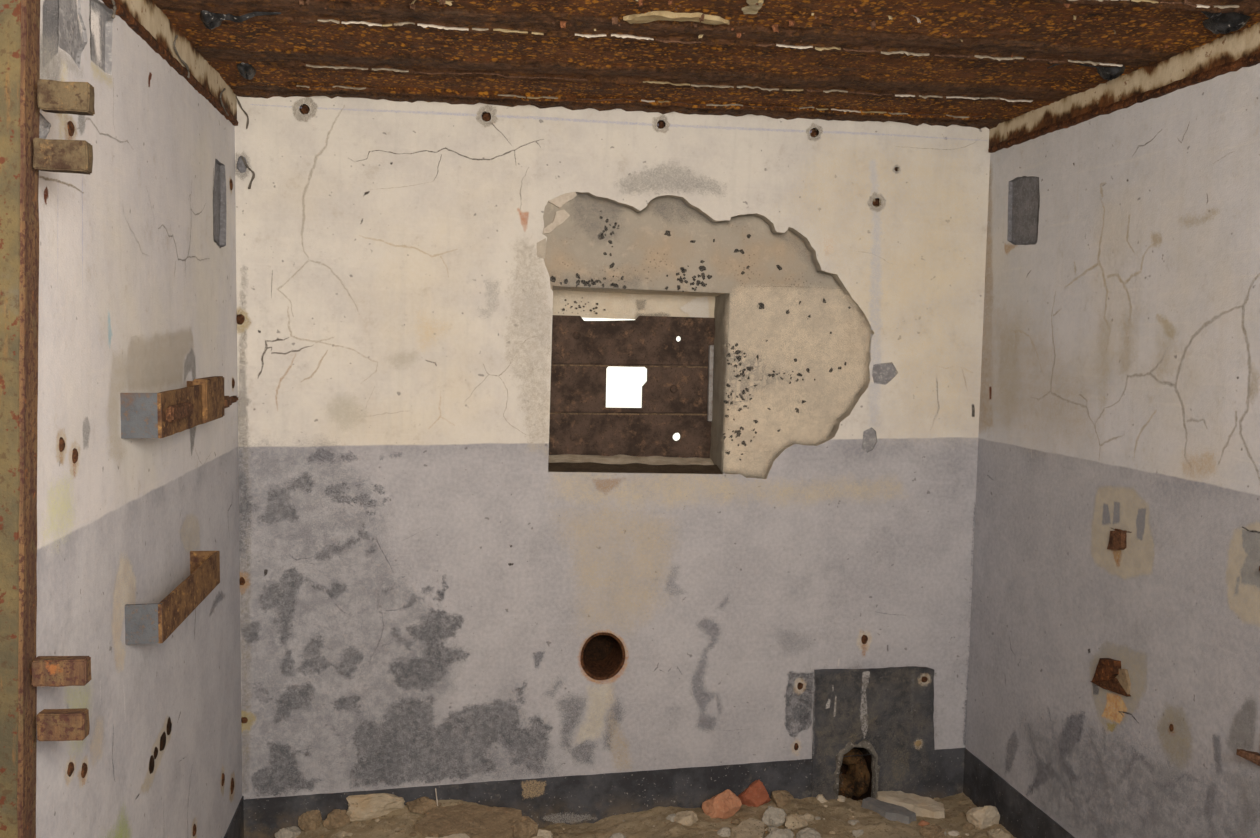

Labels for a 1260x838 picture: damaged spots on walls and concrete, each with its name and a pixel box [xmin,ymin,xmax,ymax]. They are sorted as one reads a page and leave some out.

peeling [57,0,238,126]
peeling [318,19,544,35]
peeling [575,33,701,44]
peeling [576,81,1033,133]
peeling [756,43,1123,67]
peeling [988,52,1260,153]
peeling [1098,0,1240,9]
crack [122,187,204,275]
crack [257,105,546,435]
spalling [537,192,898,479]
crack [1035,183,1260,479]
water stain [237,265,627,799]